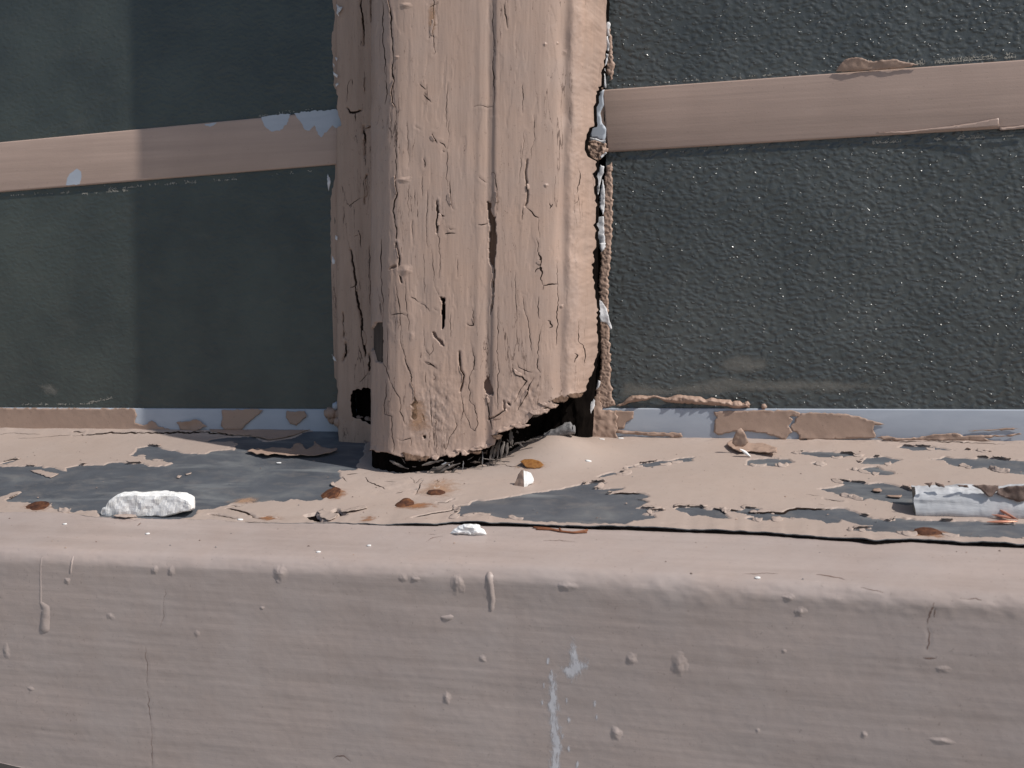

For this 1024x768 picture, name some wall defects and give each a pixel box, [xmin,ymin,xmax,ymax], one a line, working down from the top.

peeling [261,109,341,137]
crack [342,0,586,452]
peeling [590,138,606,252]
peeling [599,301,612,330]
peeling [0,408,369,520]
peeling [449,410,1024,539]
damp [541,644,588,768]